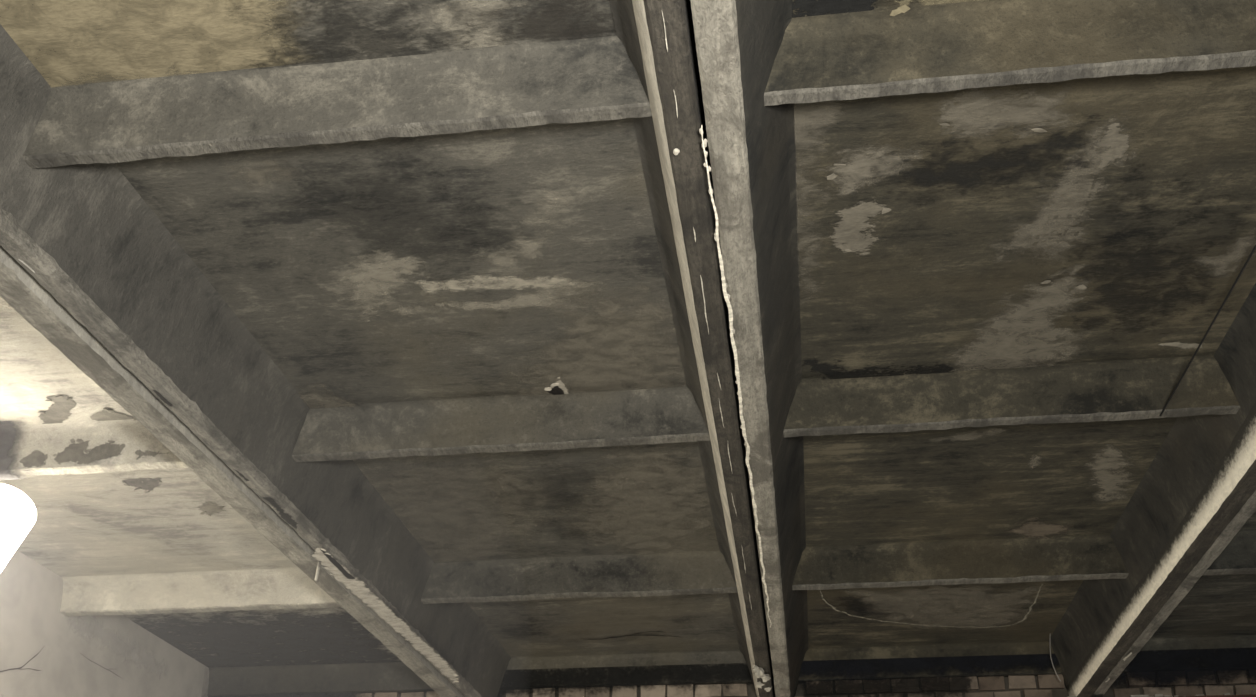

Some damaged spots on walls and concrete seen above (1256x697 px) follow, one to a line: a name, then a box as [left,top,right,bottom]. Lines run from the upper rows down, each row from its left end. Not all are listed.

peeling [890,0,979,16]
water stain [400,276,591,314]
peeling [38,395,76,424]
peeling [90,408,136,421]
peeling [20,439,162,468]
peeling [122,477,162,493]
peeling [197,501,226,517]
spalling [263,497,298,529]